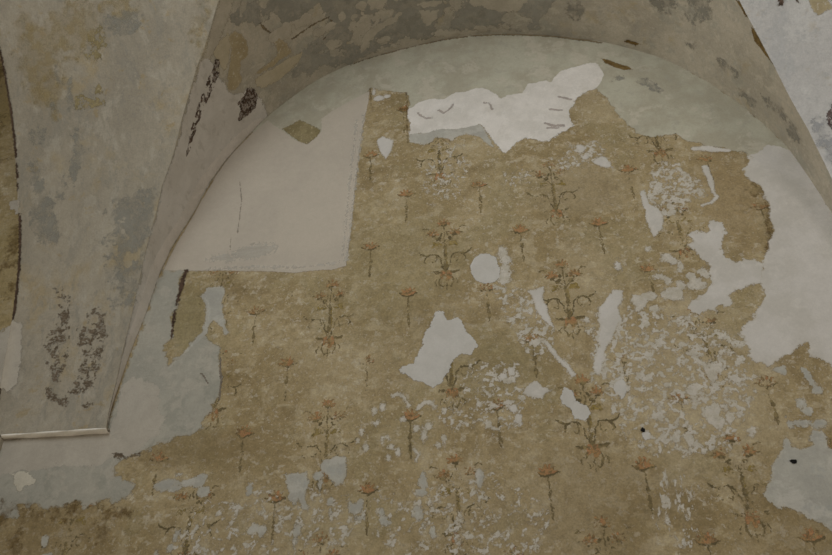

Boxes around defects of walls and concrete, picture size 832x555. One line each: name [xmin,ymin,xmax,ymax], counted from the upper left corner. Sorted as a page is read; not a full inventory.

peeling [640,161,708,252]
spalling [43,288,108,408]
peeling [165,286,229,372]
peeling [582,220,764,459]
peeling [785,367,829,444]
peeling [153,361,591,555]
peeling [652,469,700,548]